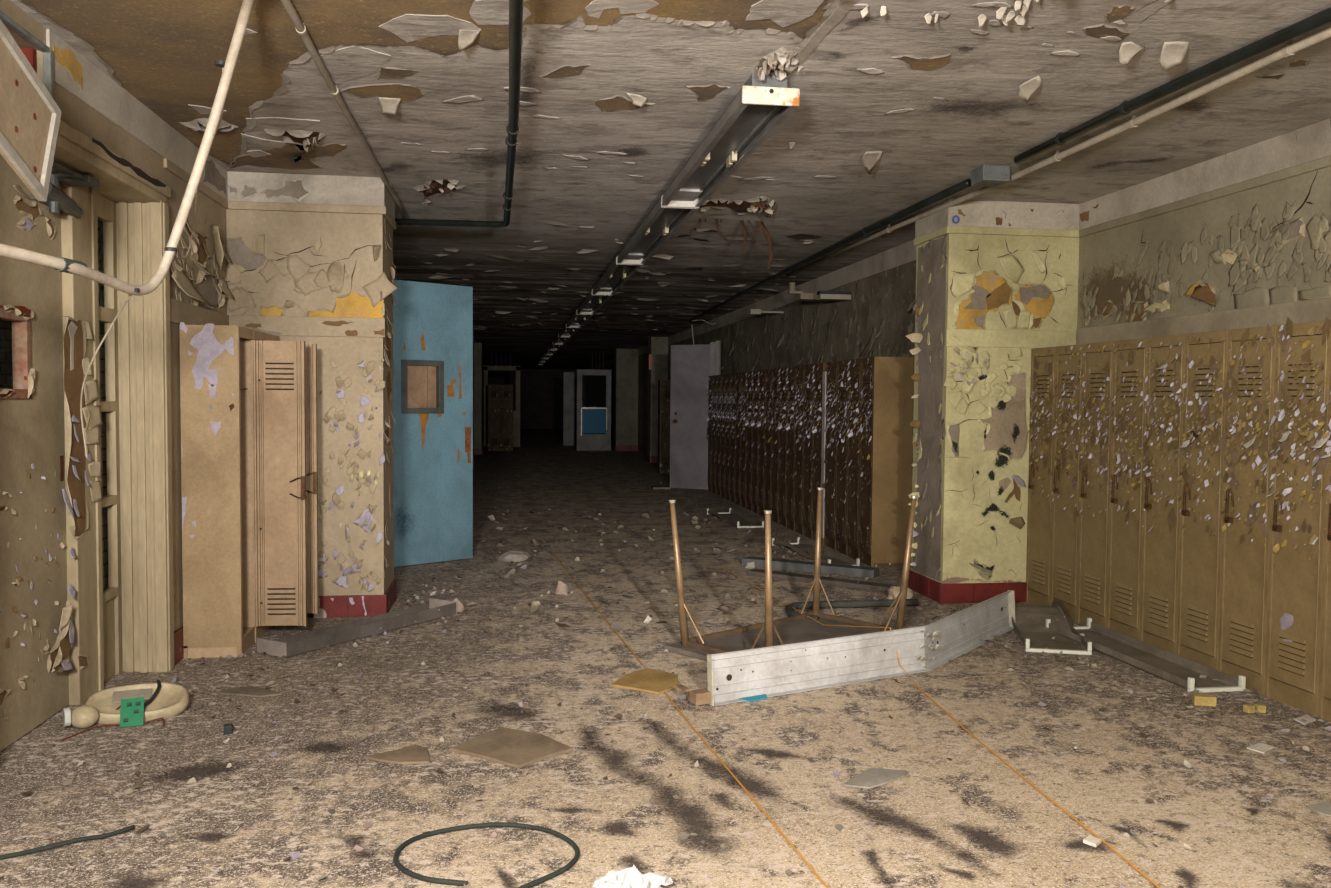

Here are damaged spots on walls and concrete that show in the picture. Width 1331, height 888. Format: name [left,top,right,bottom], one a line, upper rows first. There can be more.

peeling [17,0,887,201]
peeling [890,54,953,71]
peeling [971,0,1039,35]
peeling [1041,5,1145,65]
peeling [1159,41,1189,70]
spalling [412,179,466,206]
spalling [579,176,899,332]
crack [950,211,1100,324]
peeling [170,218,603,618]
peeling [705,359,873,511]
peeling [906,200,1331,582]
peeling [0,316,103,720]